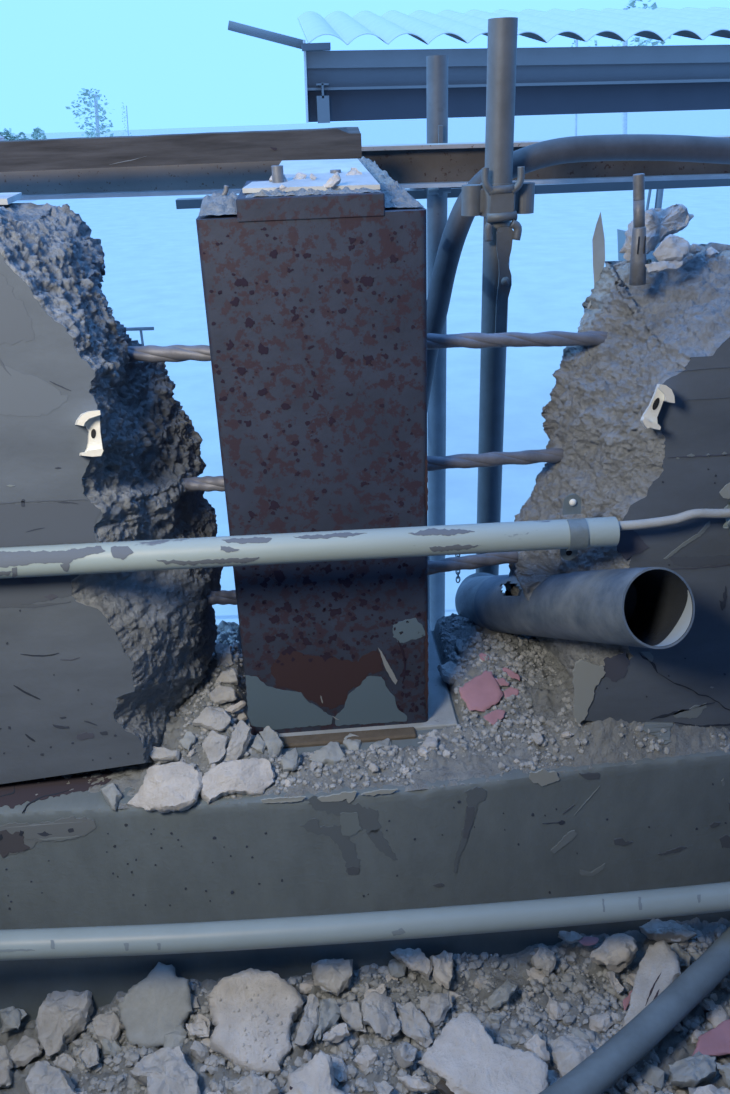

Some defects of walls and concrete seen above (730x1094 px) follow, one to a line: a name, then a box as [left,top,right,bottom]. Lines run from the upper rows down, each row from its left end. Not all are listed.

spalling [0,202,218,543]
spalling [514,242,730,522]
spalling [509,563,520,596]
spalling [558,546,633,573]
spalling [71,567,223,763]
peeling [245,675,407,730]
peeling [393,618,425,643]
spalling [533,636,633,724]
crack [640,654,730,727]